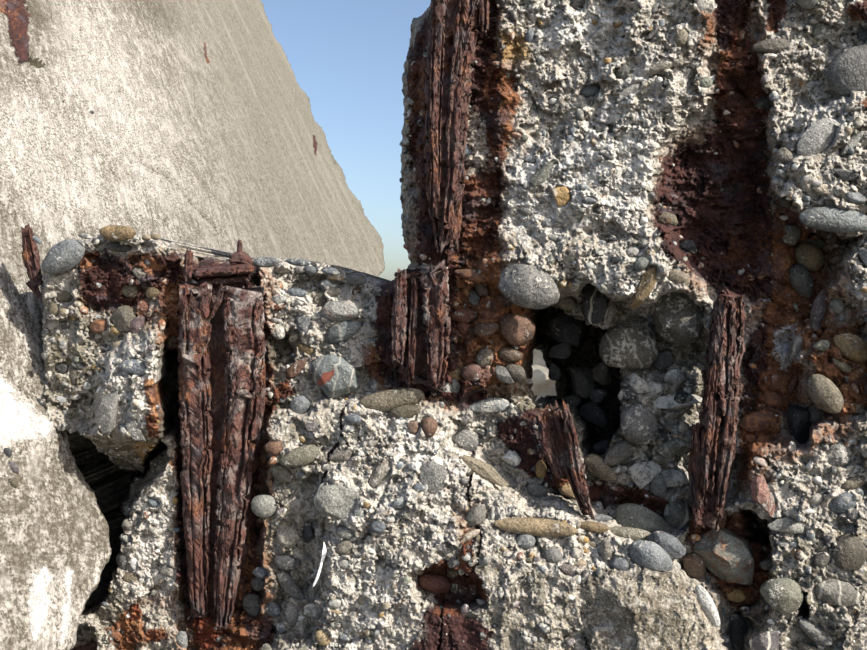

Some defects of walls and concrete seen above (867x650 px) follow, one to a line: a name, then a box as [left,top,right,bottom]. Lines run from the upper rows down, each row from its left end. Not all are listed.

rust [0,0,31,63]
rust [362,0,546,411]
spalling [158,347,178,380]
spalling [265,336,297,365]
spalling [527,306,622,456]
rust [493,0,867,613]
spalling [99,392,180,522]
rust [77,248,296,650]
crack [320,405,350,485]
crack [466,451,483,570]
rust [410,529,493,650]